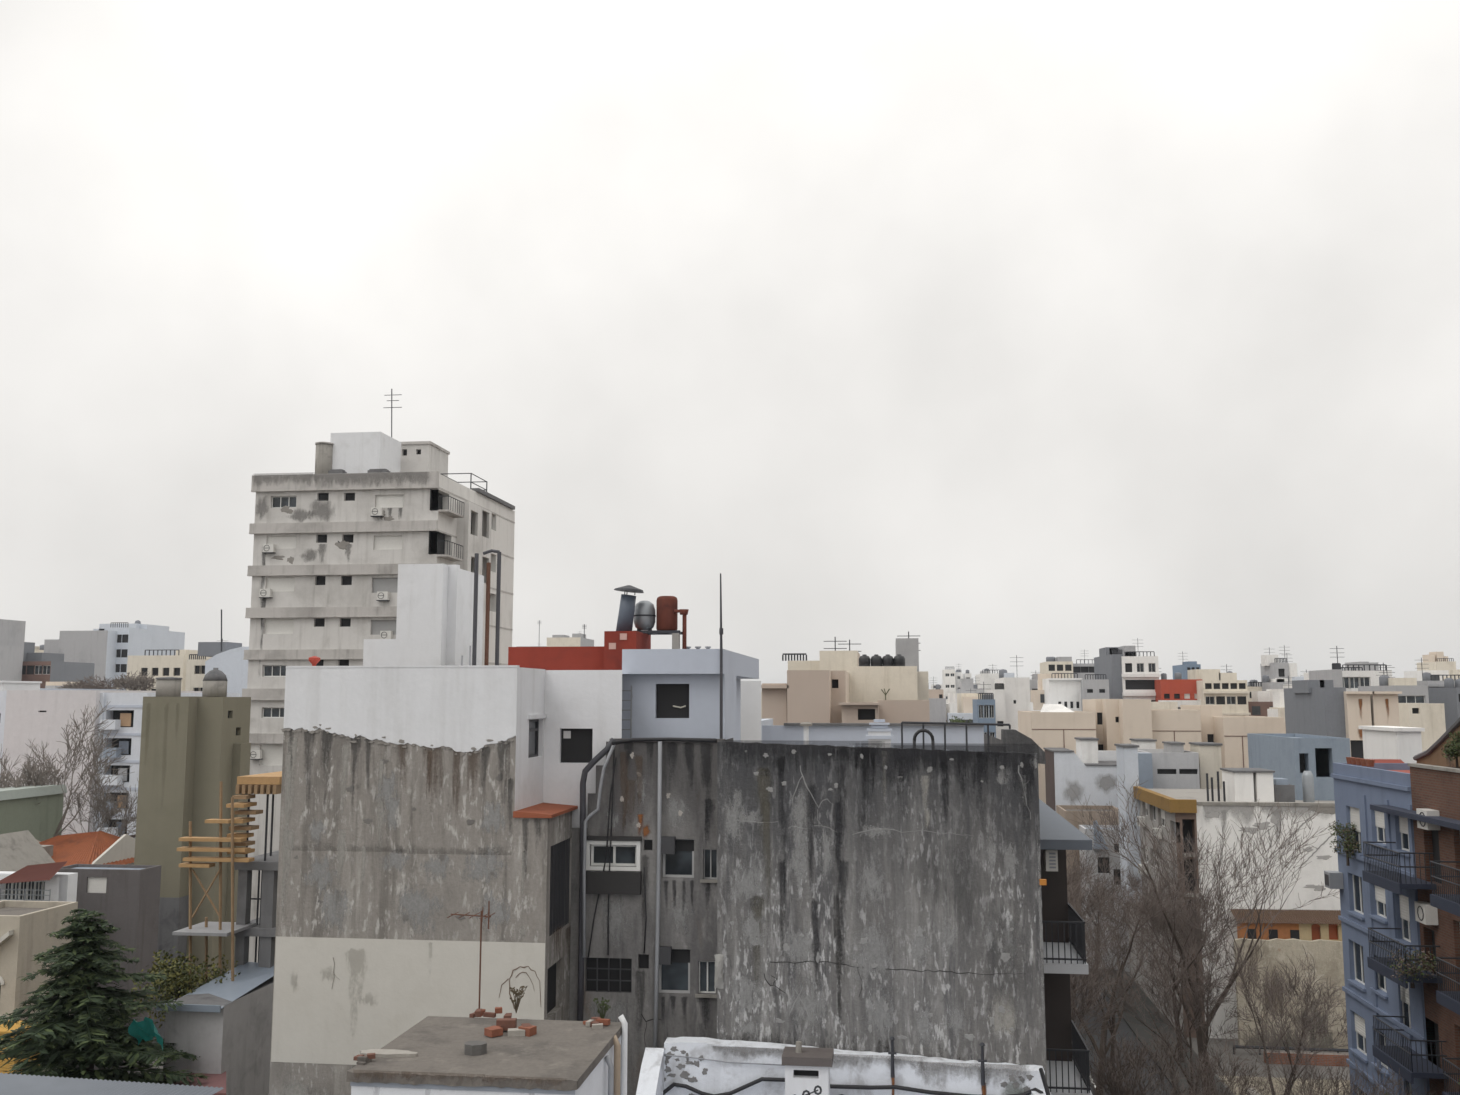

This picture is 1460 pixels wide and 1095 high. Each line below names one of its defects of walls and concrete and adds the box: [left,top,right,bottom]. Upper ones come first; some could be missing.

peeling [281,724,514,764]
leakage [625,740,1037,1032]
leakage [713,978,784,1057]
leakage [833,927,1026,1095]